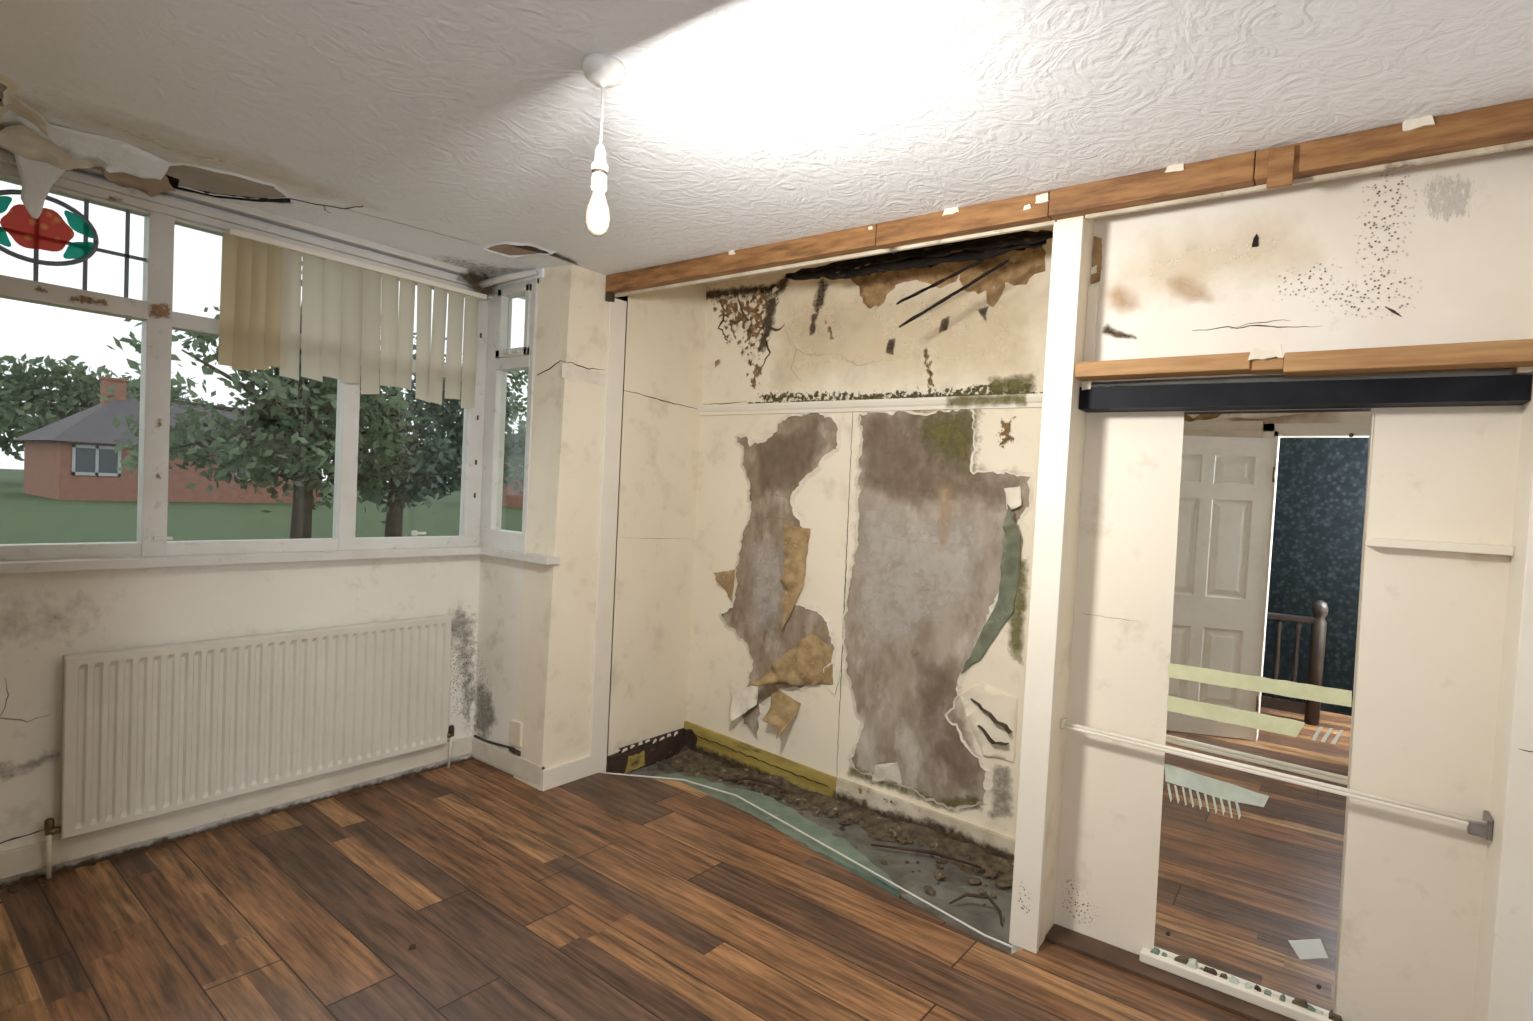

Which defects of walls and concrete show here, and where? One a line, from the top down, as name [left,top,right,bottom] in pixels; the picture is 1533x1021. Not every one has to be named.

peeling [165,162,300,207]
flaking render [706,276,788,389]
flaking render [923,348,934,389]
flaking render [851,246,1046,320]
water stain [1284,176,1408,315]
flaking render [718,409,1034,814]
mould [450,613,494,737]
water stain [0,756,473,889]